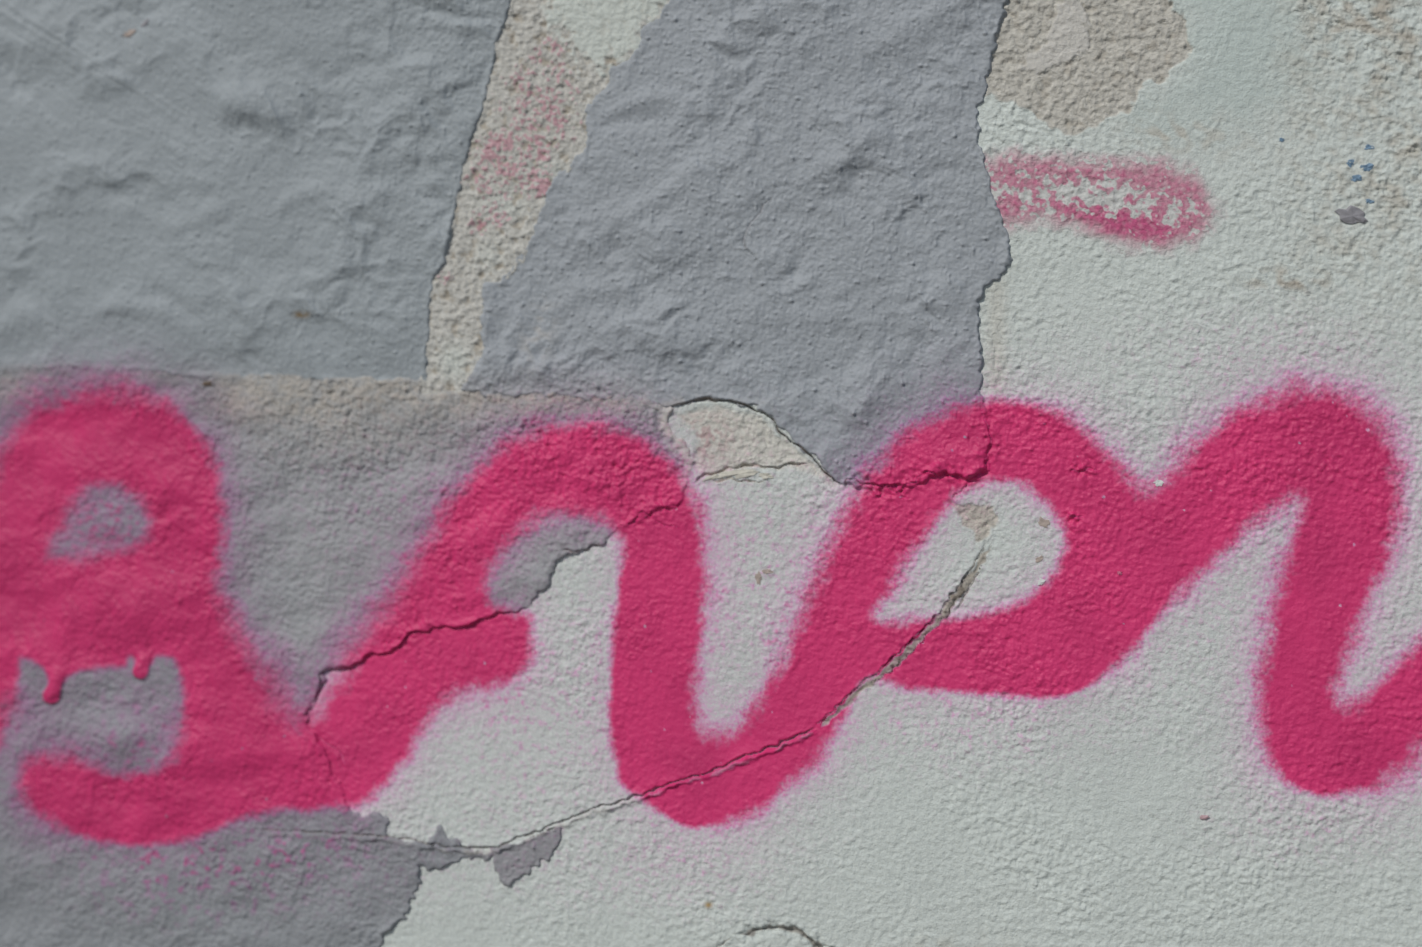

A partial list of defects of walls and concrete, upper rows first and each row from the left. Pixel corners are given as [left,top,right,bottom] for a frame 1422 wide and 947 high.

peeling [984,0,1195,138]
peeling [420,0,670,394]
peeling [671,403,835,488]
crack [562,395,992,554]
flaking render [953,501,1001,546]
crack [250,541,993,857]
peeling [469,828,562,887]
crack [715,921,835,947]